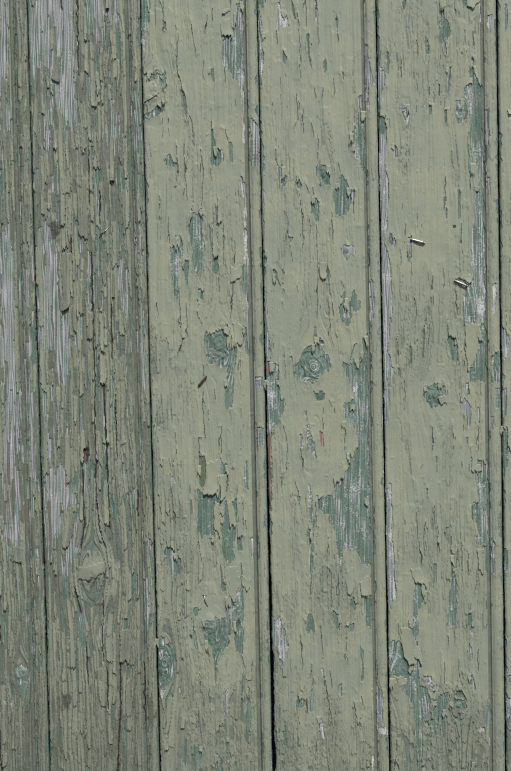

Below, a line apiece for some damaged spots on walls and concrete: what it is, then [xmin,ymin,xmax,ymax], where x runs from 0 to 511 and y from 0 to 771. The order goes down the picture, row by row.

peeling [438,0,493,54]
peeling [170,197,223,299]
peeling [230,176,249,356]
peeling [447,57,510,427]
peeling [30,0,145,771]
peeling [151,392,258,771]
peeling [272,615,312,771]
peeling [297,333,373,634]
peeling [345,563,491,771]
peeling [447,551,458,629]
peeling [466,437,509,574]
peeling [500,387,511,469]